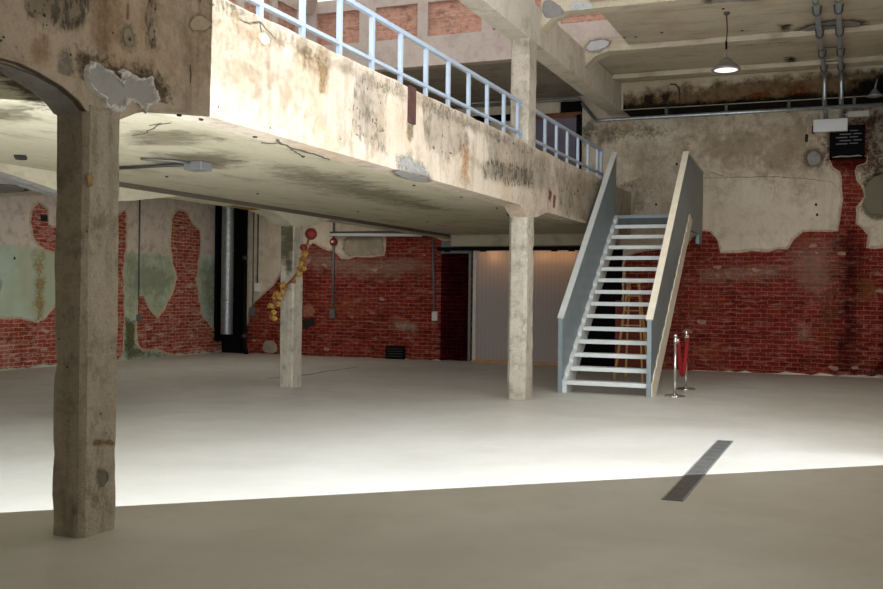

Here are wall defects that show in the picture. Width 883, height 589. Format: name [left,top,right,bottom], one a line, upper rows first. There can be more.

crack [261,139,330,160]
leakage [623,68,883,187]
flaking render [0,304,57,369]
flaking render [29,201,56,253]
flaking render [116,209,222,360]
flaking render [246,271,281,354]
flaking render [301,236,473,361]
flaking render [621,249,661,302]
flaking render [662,155,883,376]